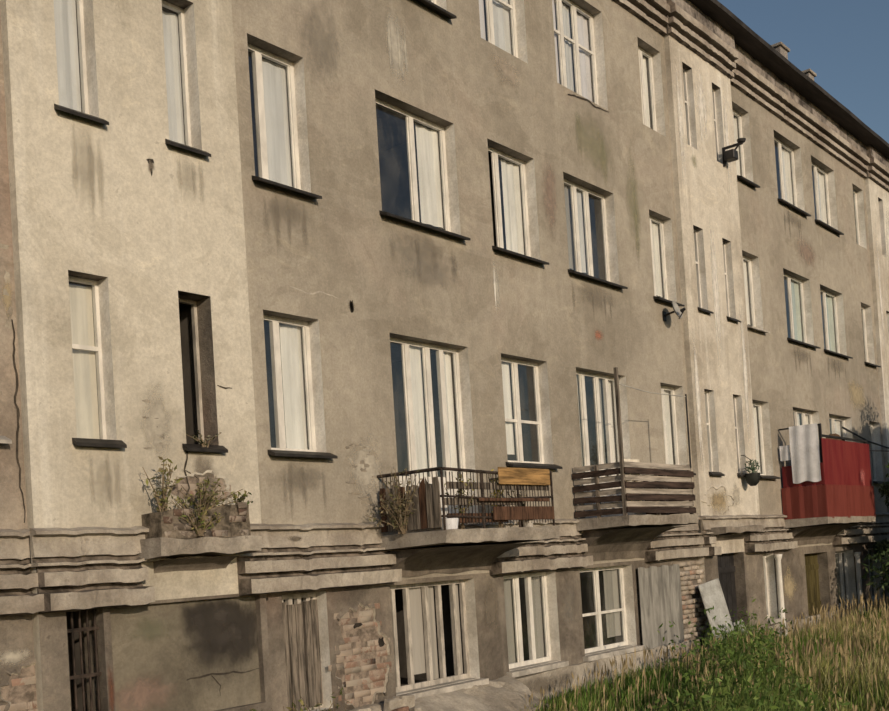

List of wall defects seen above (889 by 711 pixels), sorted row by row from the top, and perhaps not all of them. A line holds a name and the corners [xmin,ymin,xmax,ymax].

crack [11,319,26,523]
flaking render [700,484,739,516]
flaking render [0,651,37,711]
damp [186,603,255,666]
crack [187,668,259,696]
flaking render [328,600,392,709]